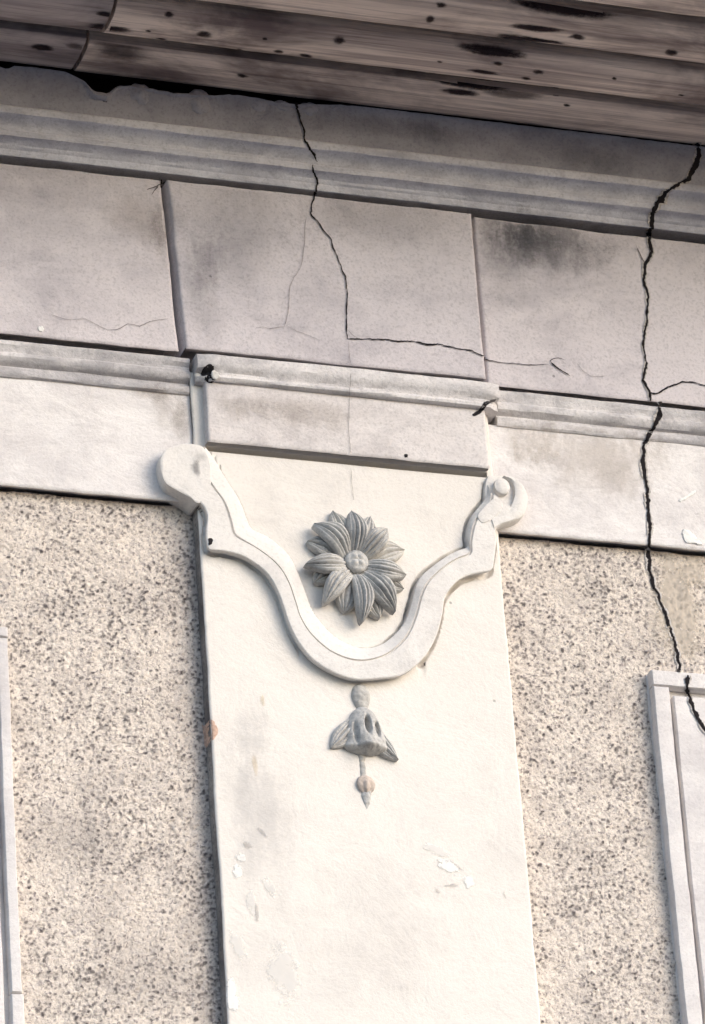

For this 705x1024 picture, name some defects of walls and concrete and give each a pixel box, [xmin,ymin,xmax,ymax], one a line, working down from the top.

crack [256,97,601,500]
crack [636,143,705,733]